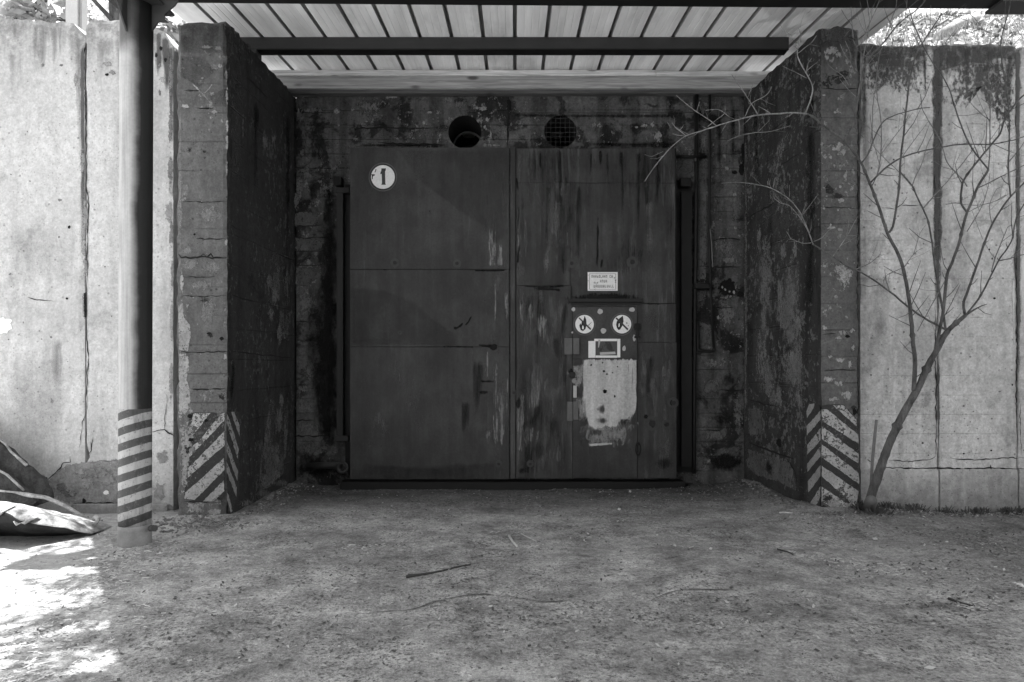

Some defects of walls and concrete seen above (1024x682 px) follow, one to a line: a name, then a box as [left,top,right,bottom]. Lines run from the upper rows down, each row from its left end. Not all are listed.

crack [49,319,116,478]
crack [82,47,90,292]
peeling [154,158,226,515]
peeling [485,176,671,466]
damp [806,97,815,300]
damp [821,29,1024,365]